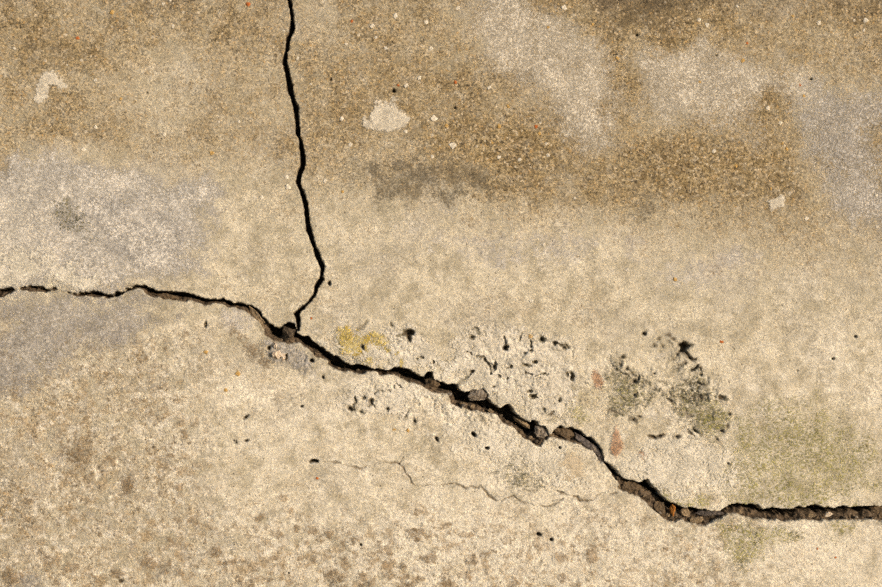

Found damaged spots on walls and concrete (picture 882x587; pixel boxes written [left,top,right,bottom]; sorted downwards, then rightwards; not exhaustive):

crack [281,0,325,332]
crack [0,285,882,527]